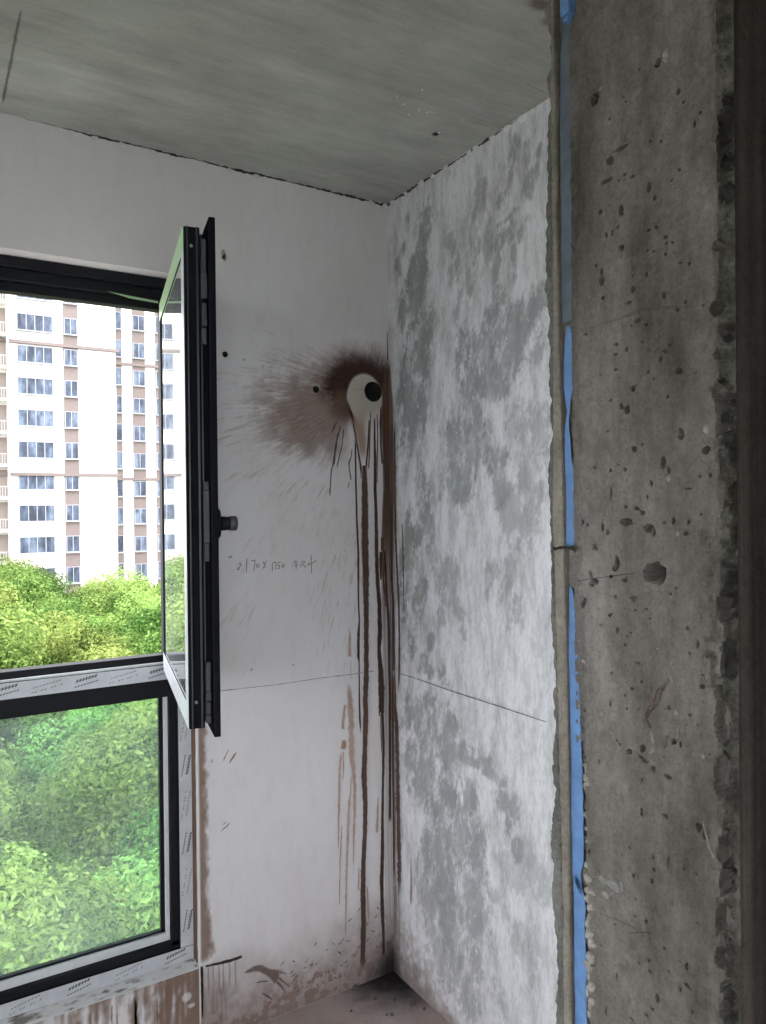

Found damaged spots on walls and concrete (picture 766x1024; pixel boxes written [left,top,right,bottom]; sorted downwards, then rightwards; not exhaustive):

damp [217,313,421,1000]